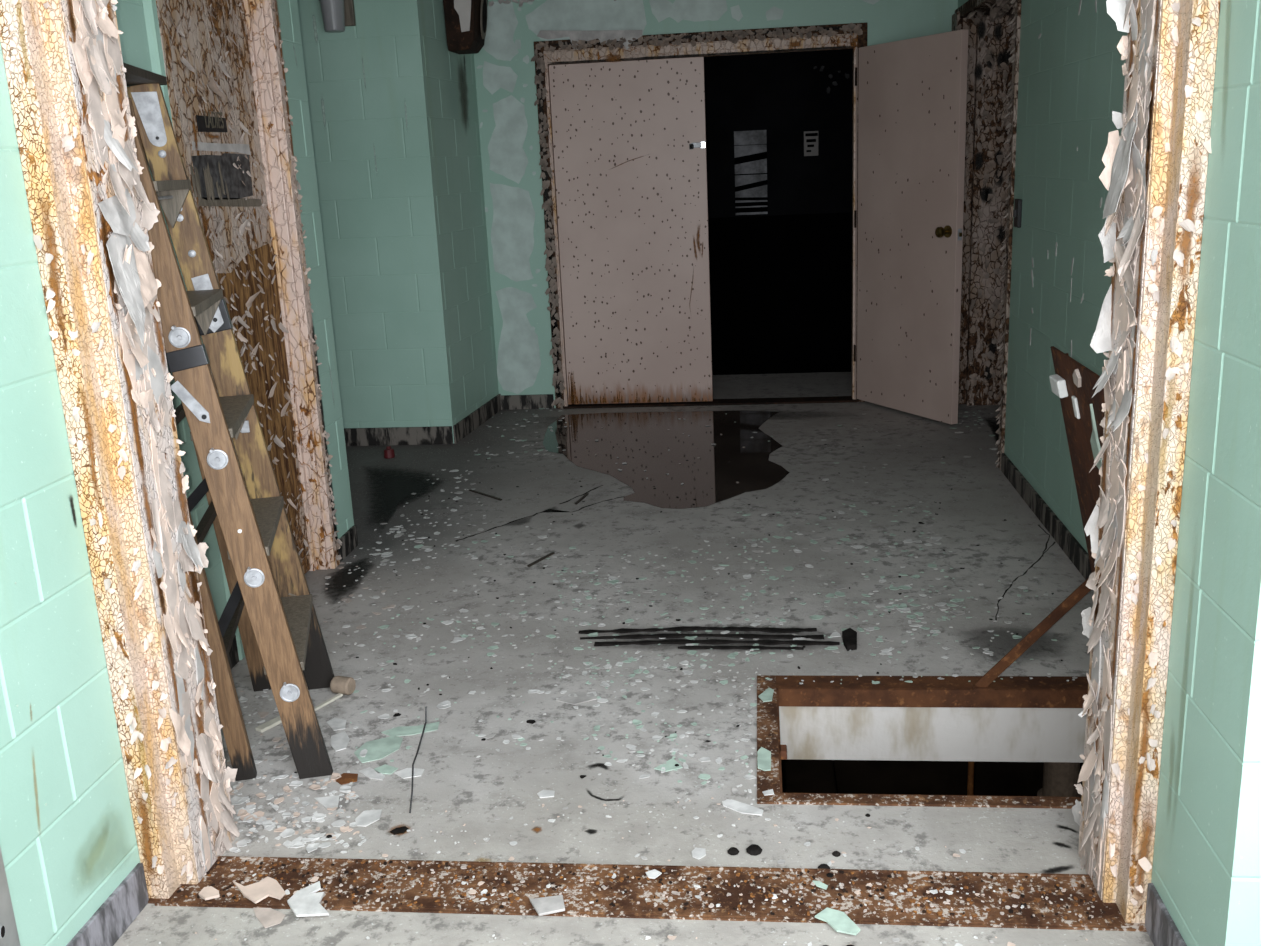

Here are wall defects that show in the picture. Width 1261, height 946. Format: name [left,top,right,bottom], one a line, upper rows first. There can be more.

peeling [1185,85,1212,153]
peeling [33,207,104,356]
peeling [167,0,301,530]
peeling [272,1,342,561]
peeling [476,0,743,394]
peeling [61,0,240,884]
spalling [722,0,1200,906]
crack [995,525,1056,620]
peeling [198,886,220,900]
peeling [233,876,329,928]
peeling [530,895,565,916]
peeling [645,869,662,879]